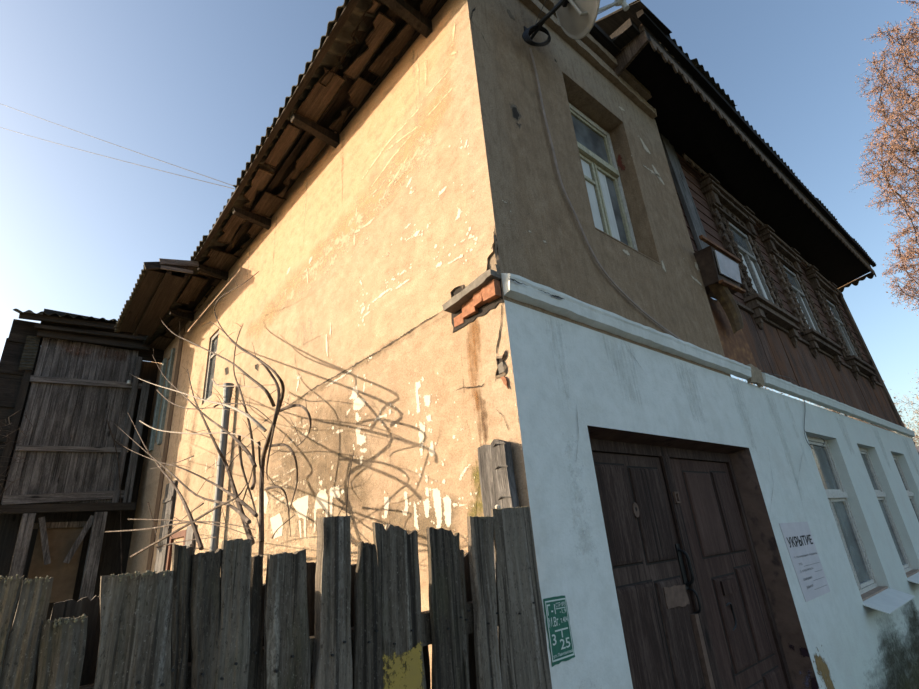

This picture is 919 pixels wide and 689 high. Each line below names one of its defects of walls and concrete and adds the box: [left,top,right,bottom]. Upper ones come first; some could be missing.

peeling [273,23,457,326]
peeling [425,207,478,271]
flaking render [442,235,504,333]
rust [469,322,487,438]
peeling [193,366,397,569]
peeling [402,377,477,530]
peeling [789,645,835,689]
mould [881,600,919,689]